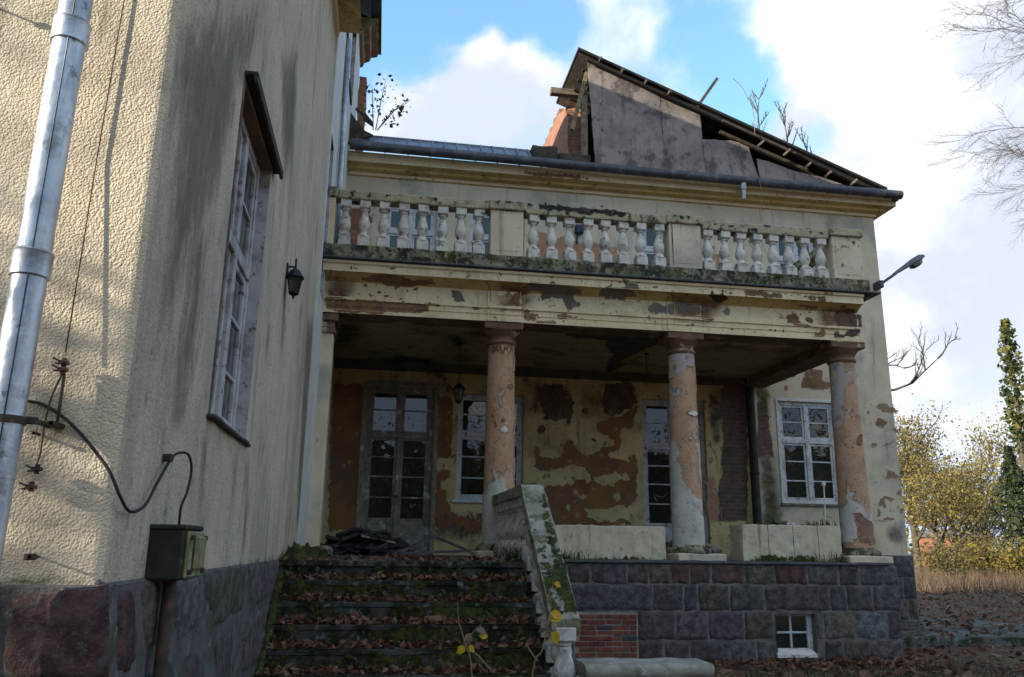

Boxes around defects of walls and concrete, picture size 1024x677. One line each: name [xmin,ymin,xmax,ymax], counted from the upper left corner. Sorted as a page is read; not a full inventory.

leakage [169,32,249,289]
leakage [283,70,295,154]
peeling [325,266,440,314]
peeling [451,288,480,310]
peeling [599,278,745,331]
flaking render [769,292,862,338]
leakage [298,327,312,519]
peeling [327,378,368,535]
peeling [433,395,516,544]
peeling [509,277,658,526]
peeling [669,348,705,547]
peeling [838,469,905,545]